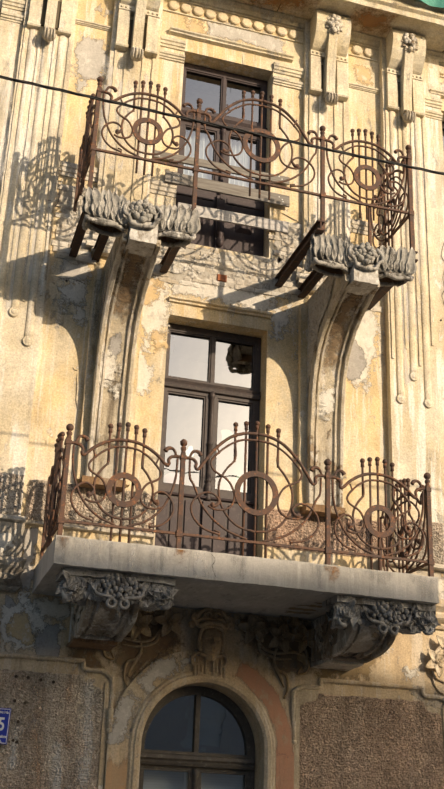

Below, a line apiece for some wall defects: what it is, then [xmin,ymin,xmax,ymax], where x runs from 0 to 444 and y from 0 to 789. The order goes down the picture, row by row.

peeling [71,36,126,162]
peeling [138,76,148,171]
flaking render [27,183,116,282]
peeling [99,332,126,399]
flaking render [136,221,334,397]
peeling [314,381,337,424]
peeling [347,302,384,398]
peeling [0,525,71,652]
peeling [106,649,199,745]